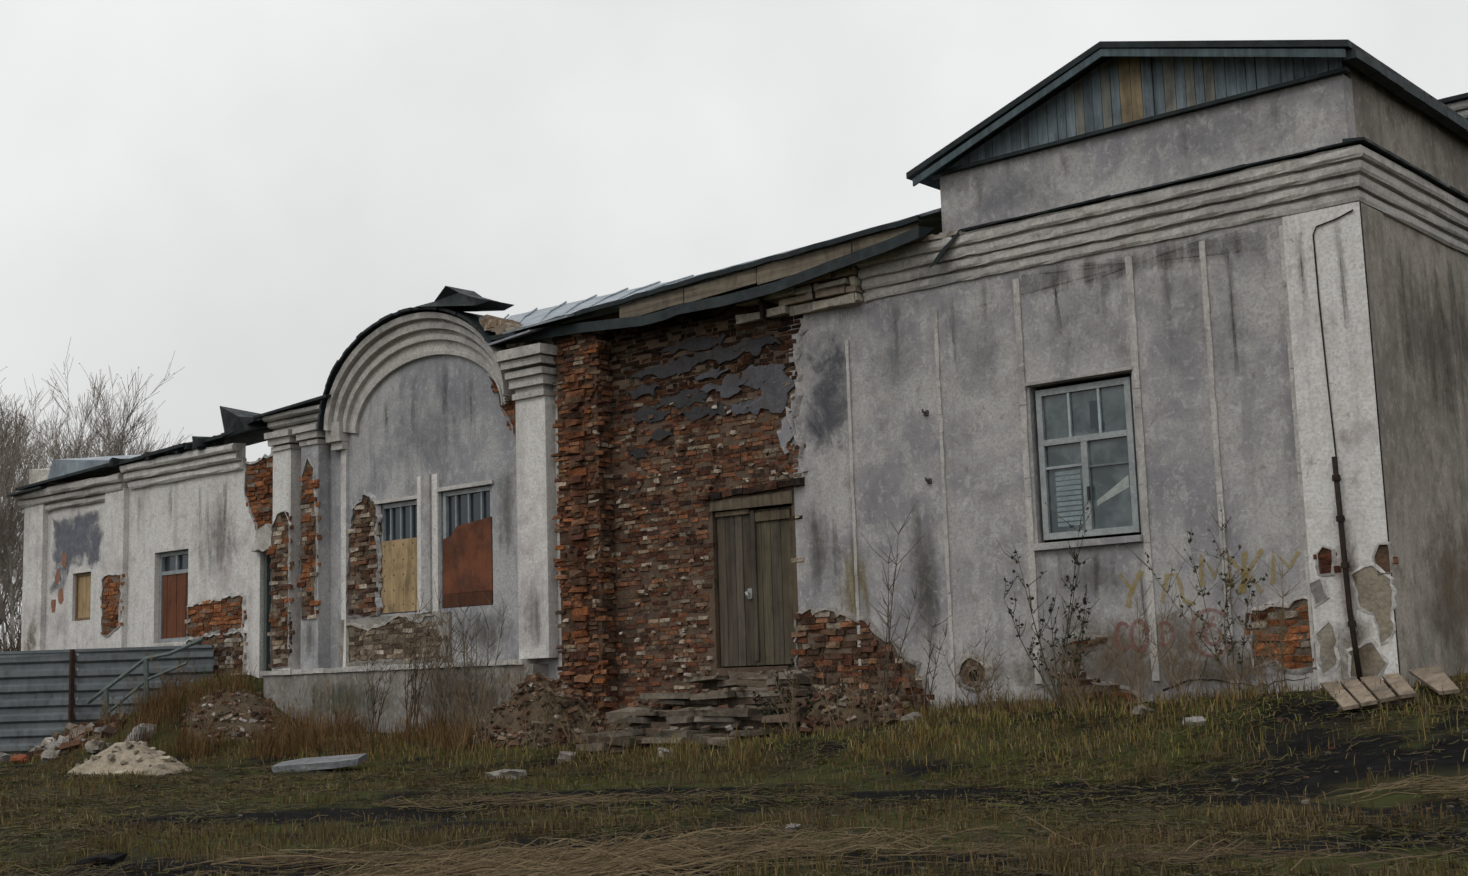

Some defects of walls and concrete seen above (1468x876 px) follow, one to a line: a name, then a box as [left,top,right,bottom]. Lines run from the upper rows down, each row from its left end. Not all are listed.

flaking render [51,514,125,638]
flaking render [185,592,248,678]
flaking render [244,452,322,670]
flaking render [346,490,448,666]
corrosion [443,516,493,594]
flaking render [550,330,796,721]
peeling [1244,542,1399,679]